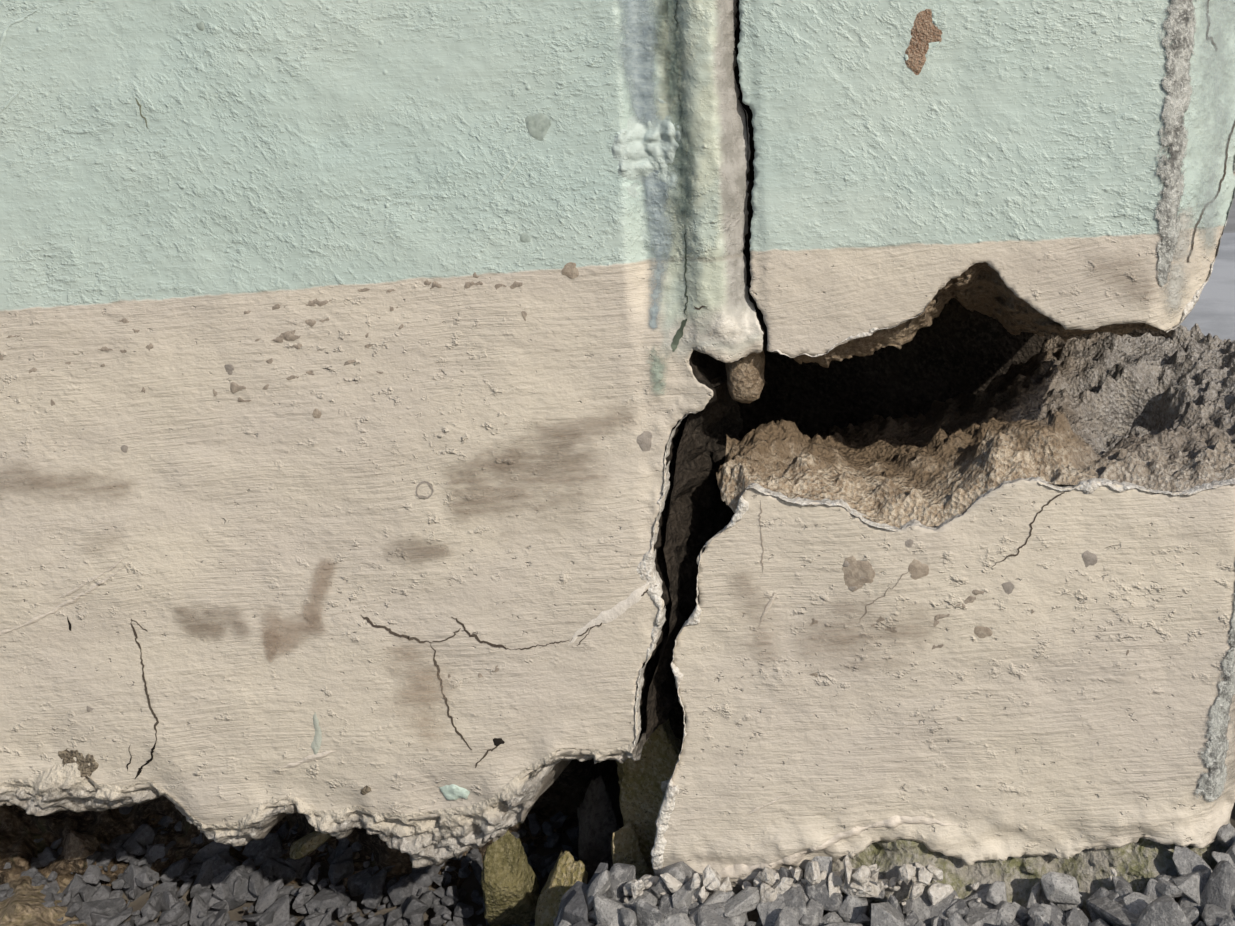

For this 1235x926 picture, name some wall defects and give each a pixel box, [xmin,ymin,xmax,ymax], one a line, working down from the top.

leakage [619,0,693,328]
crack [735,0,755,189]
peeling [904,9,942,75]
crack [671,226,706,352]
crack [745,218,768,352]
spalling [771,154,1235,368]
crack [126,619,159,779]
crack [360,614,602,768]
crack [632,372,775,870]
spalling [745,483,894,531]
spalling [905,539,929,580]
flaking render [0,725,659,868]